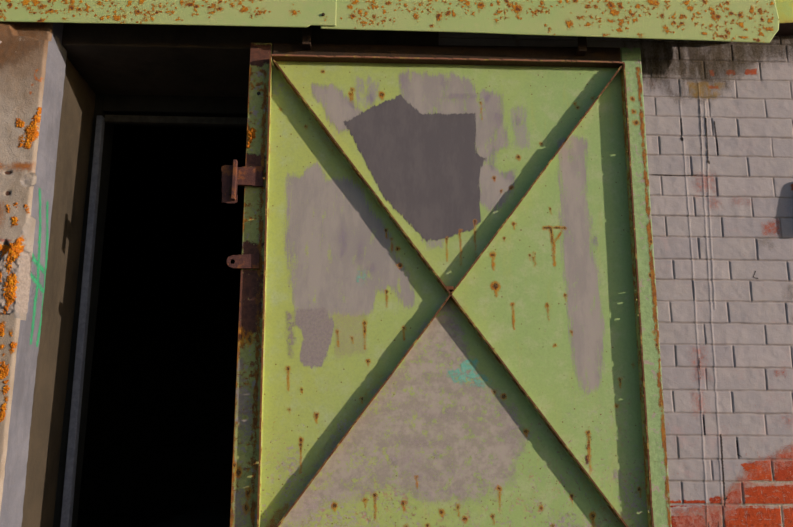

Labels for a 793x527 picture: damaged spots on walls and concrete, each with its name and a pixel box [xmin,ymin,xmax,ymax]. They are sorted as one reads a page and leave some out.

rust [340,0,776,43]
spalling [0,216,36,320]
rust [230,67,267,527]
rust [542,225,567,267]
rust [266,373,385,527]
rust [585,431,593,471]
peeling [670,443,793,527]